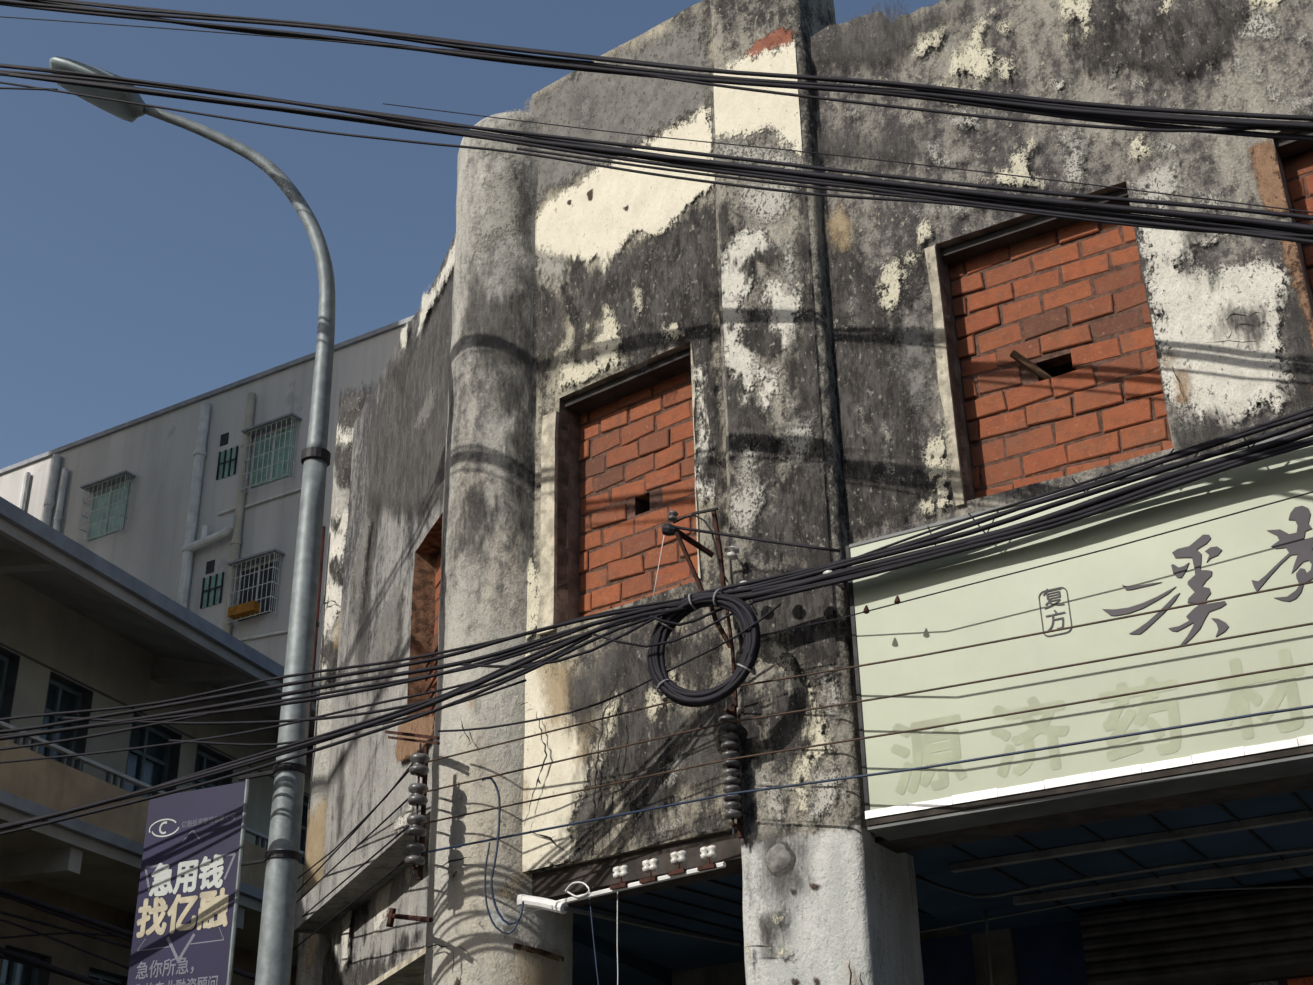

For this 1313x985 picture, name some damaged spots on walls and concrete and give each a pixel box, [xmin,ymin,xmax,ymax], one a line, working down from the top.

leakage [810,7,950,64]
leakage [1066,0,1247,79]
peeling [1203,0,1313,114]
leakage [319,12,837,769]
peeling [400,27,814,465]
peeling [692,362,765,536]
leakage [823,203,933,533]
peeling [1124,131,1313,432]
peeling [363,577,401,684]
leakage [336,749,344,837]
leakage [569,617,723,851]